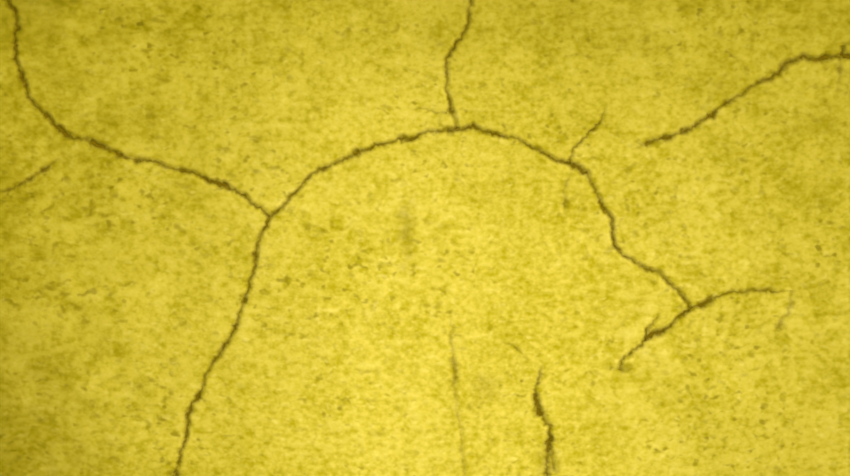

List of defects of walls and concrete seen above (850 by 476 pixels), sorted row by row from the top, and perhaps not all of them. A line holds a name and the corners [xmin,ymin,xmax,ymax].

crack [761,45,850,82]
crack [645,101,730,146]
crack [7,0,507,476]
crack [525,143,730,364]
crack [533,377,553,476]